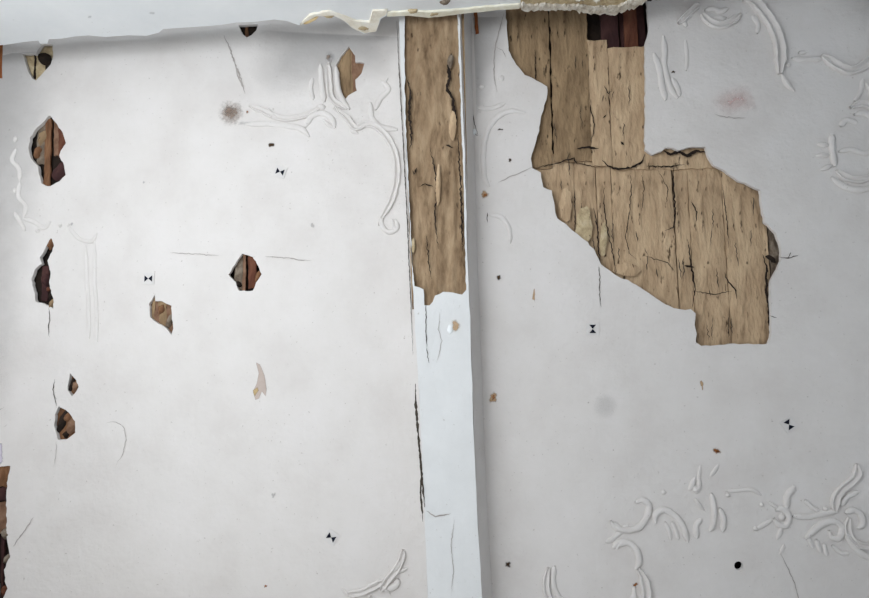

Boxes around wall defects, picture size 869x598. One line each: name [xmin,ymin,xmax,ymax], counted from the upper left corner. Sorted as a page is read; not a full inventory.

flaking render [25,46,53,80]
flaking render [31,117,66,186]
flaking render [300,0,779,346]
flaking render [34,239,54,307]
flaking render [230,254,261,291]
flaking render [151,298,173,333]
flaking render [56,408,75,439]
crack [414,384,454,589]
flaking render [0,466,10,598]